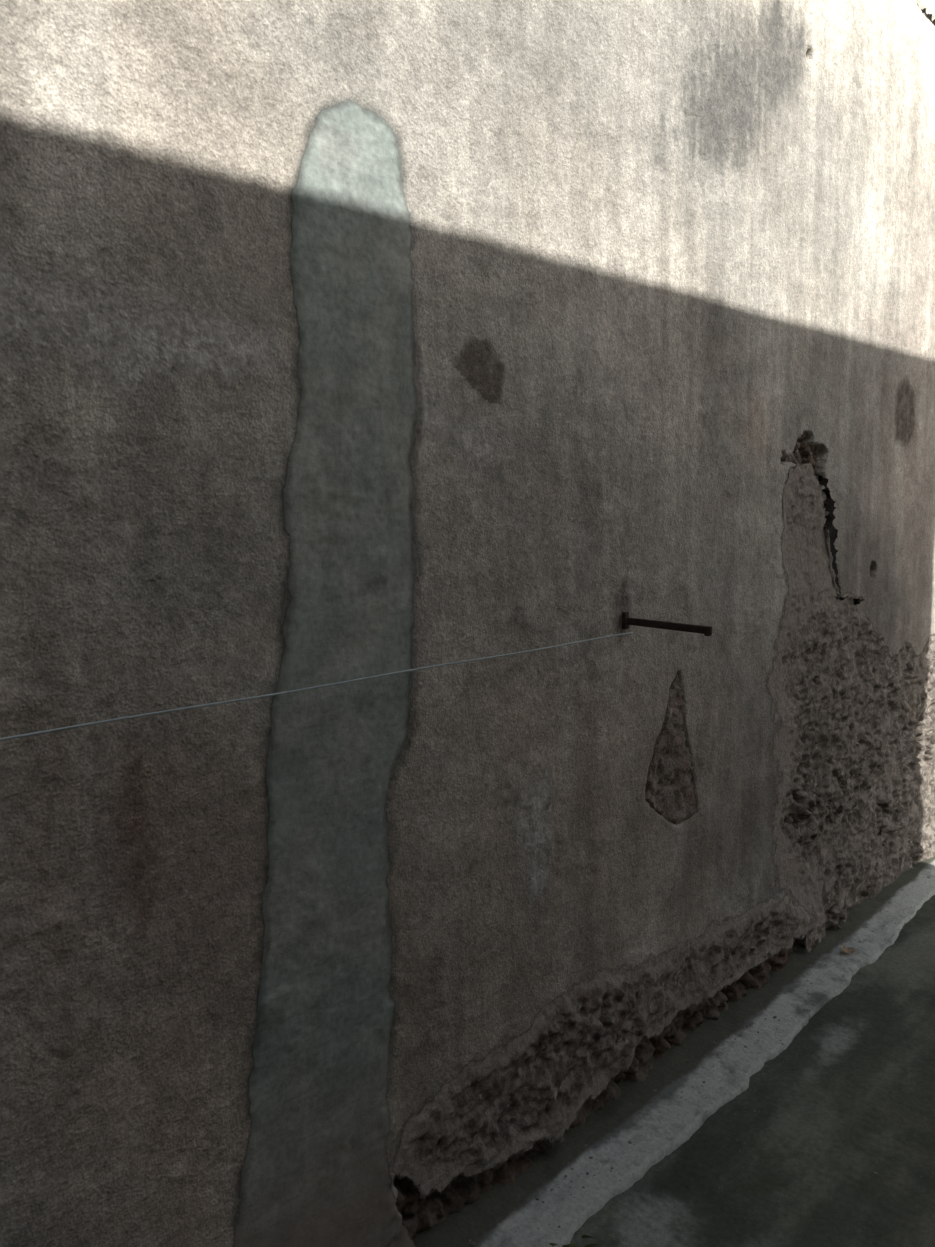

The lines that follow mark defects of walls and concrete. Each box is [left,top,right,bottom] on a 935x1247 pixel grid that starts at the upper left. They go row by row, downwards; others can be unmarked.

flaking render [570,434,935,1128]
flaking render [393,1137,557,1239]